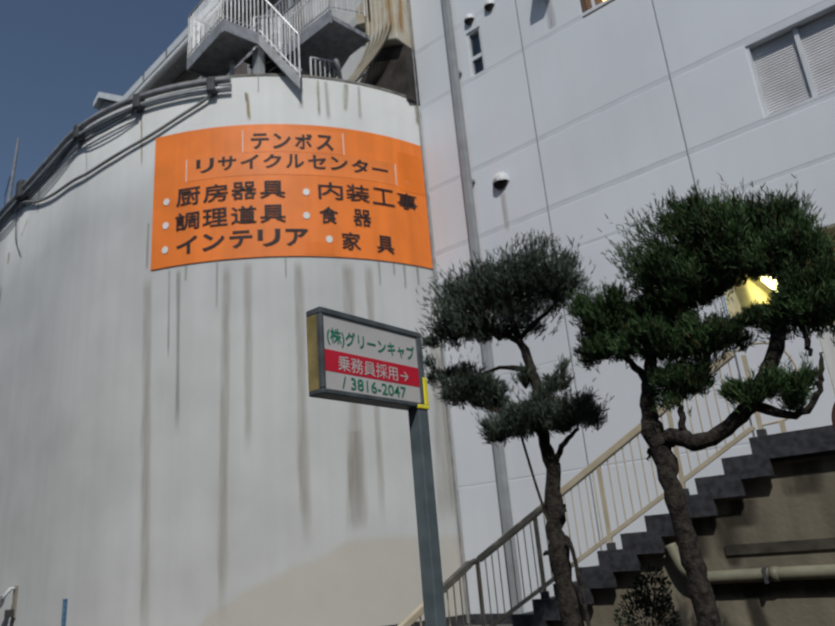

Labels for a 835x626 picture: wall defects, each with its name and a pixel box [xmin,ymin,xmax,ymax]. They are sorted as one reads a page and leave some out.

corrosion [387,0,402,26]